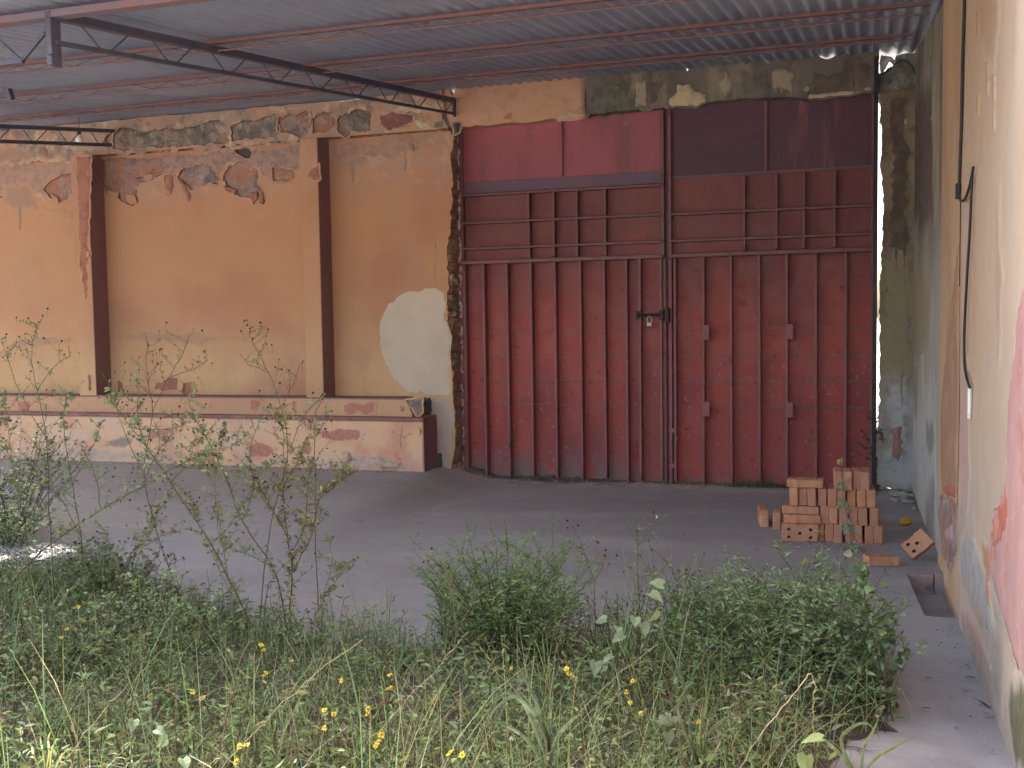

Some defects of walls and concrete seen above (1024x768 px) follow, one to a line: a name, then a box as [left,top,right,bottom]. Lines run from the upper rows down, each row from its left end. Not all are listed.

peeling [637,82,708,112]
peeling [806,84,874,100]
water stain [885,53,936,286]
flaking render [0,99,465,469]
flaking render [886,424,907,465]